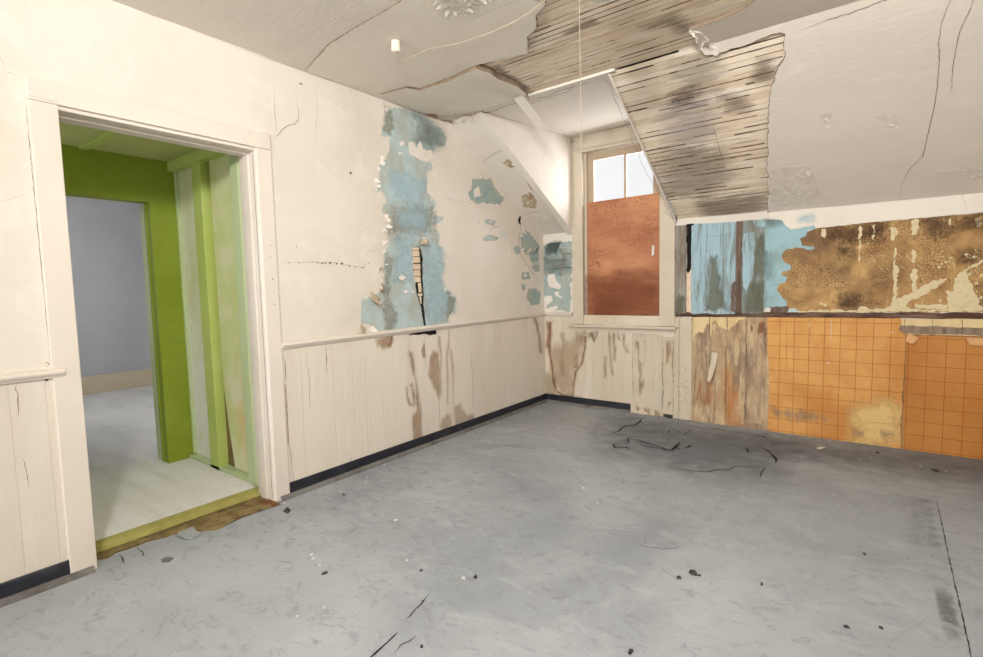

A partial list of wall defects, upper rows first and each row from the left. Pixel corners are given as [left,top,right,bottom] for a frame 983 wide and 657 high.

peeling [360,107,481,340]
peeling [468,178,503,241]
flaking render [483,0,822,313]
crack [899,1,973,193]
leakage [408,340,440,439]